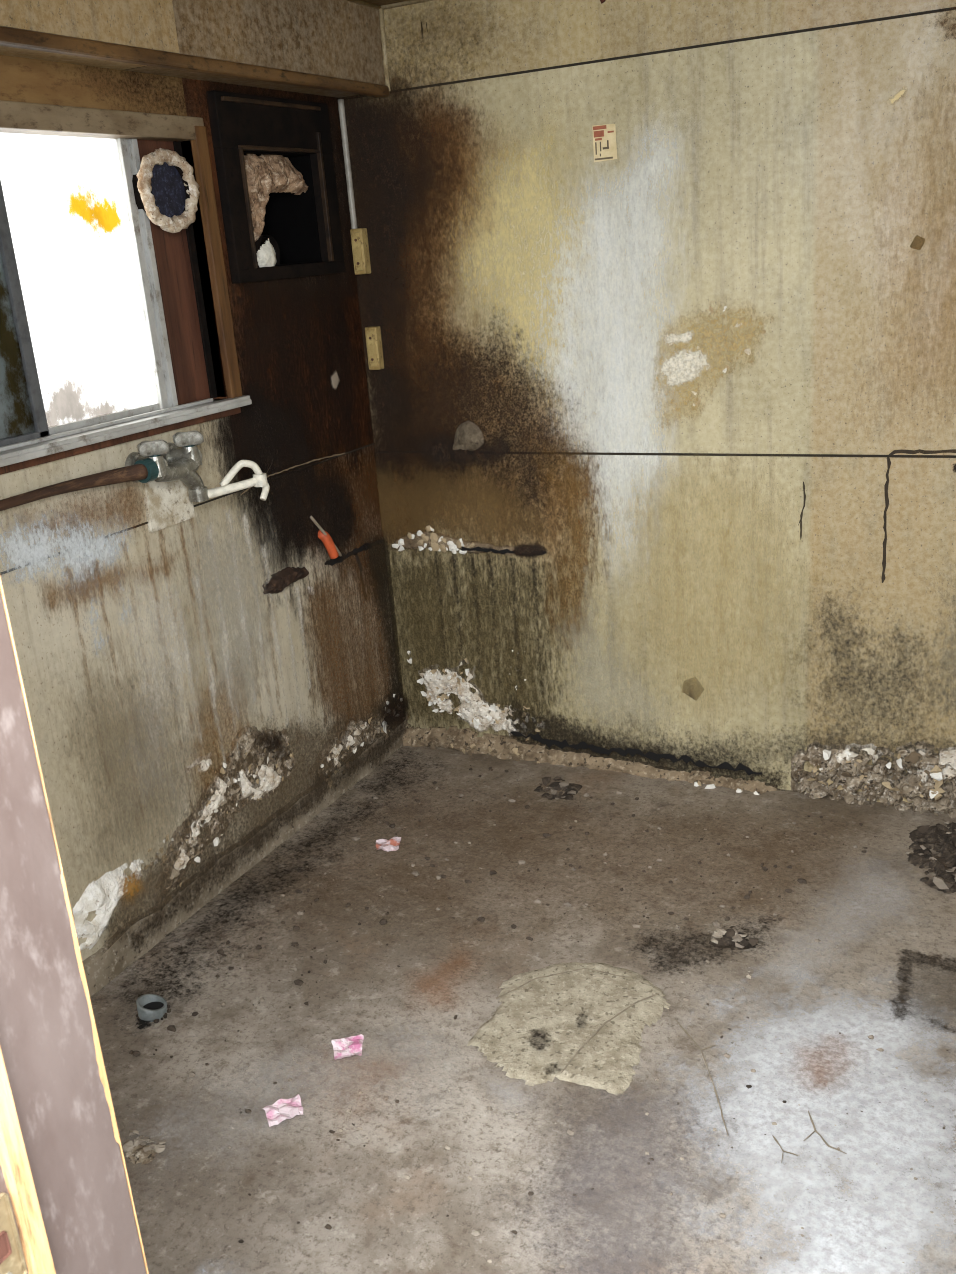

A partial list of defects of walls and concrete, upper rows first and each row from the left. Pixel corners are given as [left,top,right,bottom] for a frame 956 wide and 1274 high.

leakage [443,136,673,530]
peeling [656,306,772,425]
leakage [115,751,424,1010]
leakage [105,463,955,949]
spalling [790,741,956,818]
spalling [530,1029,551,1050]
leakage [535,950,956,1274]